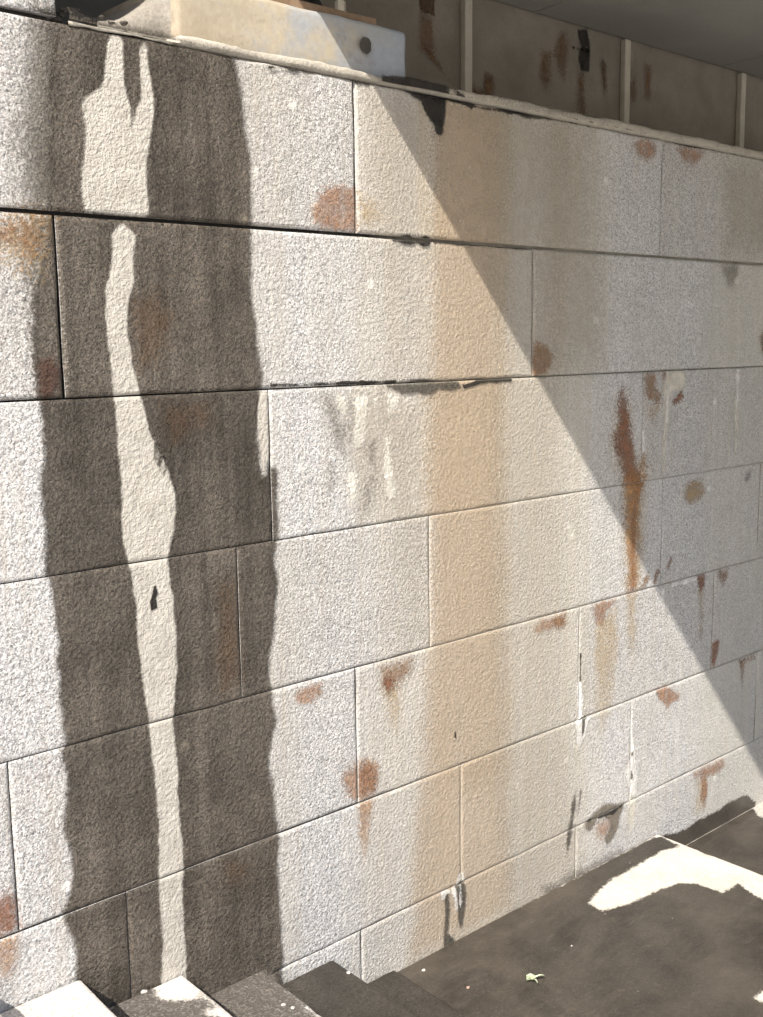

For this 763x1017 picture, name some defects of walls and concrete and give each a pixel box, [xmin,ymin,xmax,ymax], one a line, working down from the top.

corrosion [419,0,441,69]
corrosion [310,185,366,233]
corrosion [532,342,552,376]
water stain [29,2,527,1017]
corrosion [614,391,672,590]
corrosion [379,657,415,692]
corrosion [656,686,679,707]
corrosion [341,760,379,829]
corrosion [694,759,723,798]
spalling [585,803,624,844]